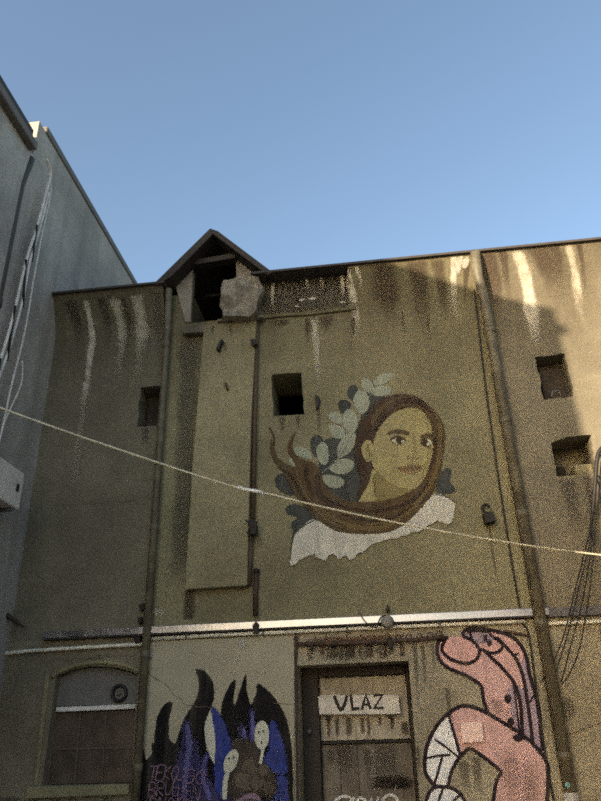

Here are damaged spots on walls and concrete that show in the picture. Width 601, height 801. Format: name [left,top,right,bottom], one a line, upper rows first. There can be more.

damp [67,296,147,397]
damp [262,266,361,362]
damp [410,256,470,300]
damp [483,244,584,327]
rust [295,631,445,658]